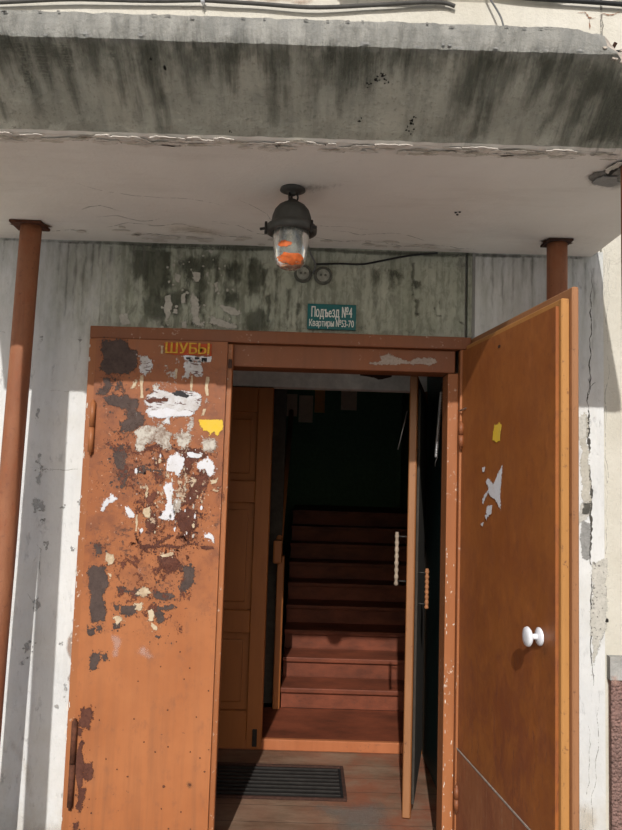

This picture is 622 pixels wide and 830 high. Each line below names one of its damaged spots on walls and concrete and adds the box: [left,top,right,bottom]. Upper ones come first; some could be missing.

peeling [84,205,273,330]
water stain [105,242,278,331]
water stain [310,248,530,257]
peeling [360,353,437,380]
peeling [75,337,225,645]
crack [579,249,610,696]
peeling [590,559,608,665]
peeling [54,682,100,830]
crack [583,722,599,822]